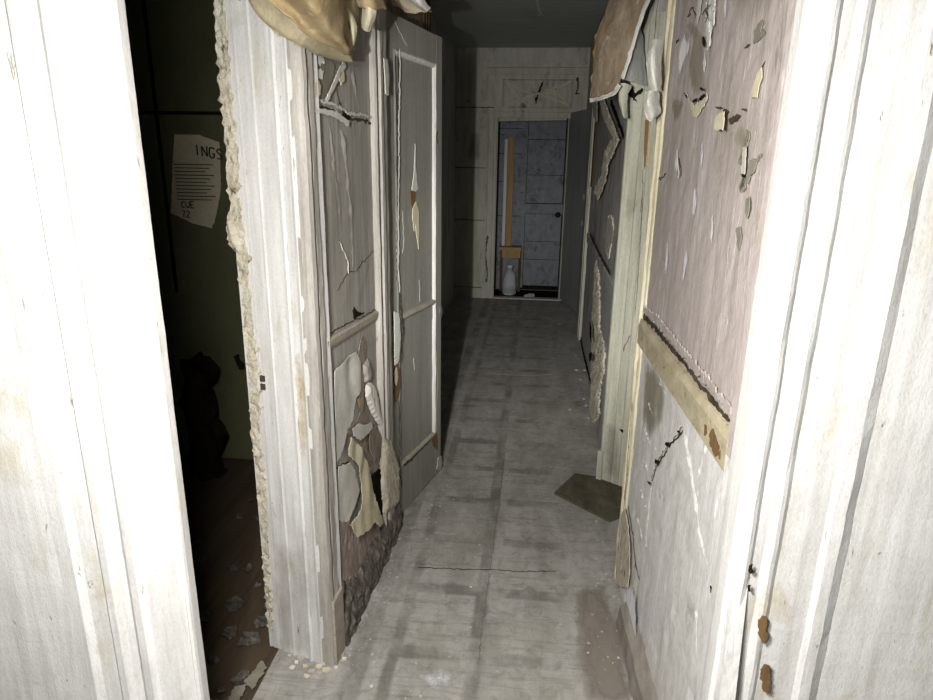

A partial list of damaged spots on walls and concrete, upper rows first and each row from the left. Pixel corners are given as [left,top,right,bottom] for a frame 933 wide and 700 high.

crack [319,89,372,125]
peeling [628,39,662,121]
peeling [684,0,745,131]
flaking render [213,0,274,631]
crack [331,309,376,334]
crack [337,241,373,291]
crack [396,49,420,364]
peeling [736,129,762,251]
flaking render [339,334,383,581]
crack [624,404,683,580]
peeling [758,615,768,643]
peeling [759,664,771,694]